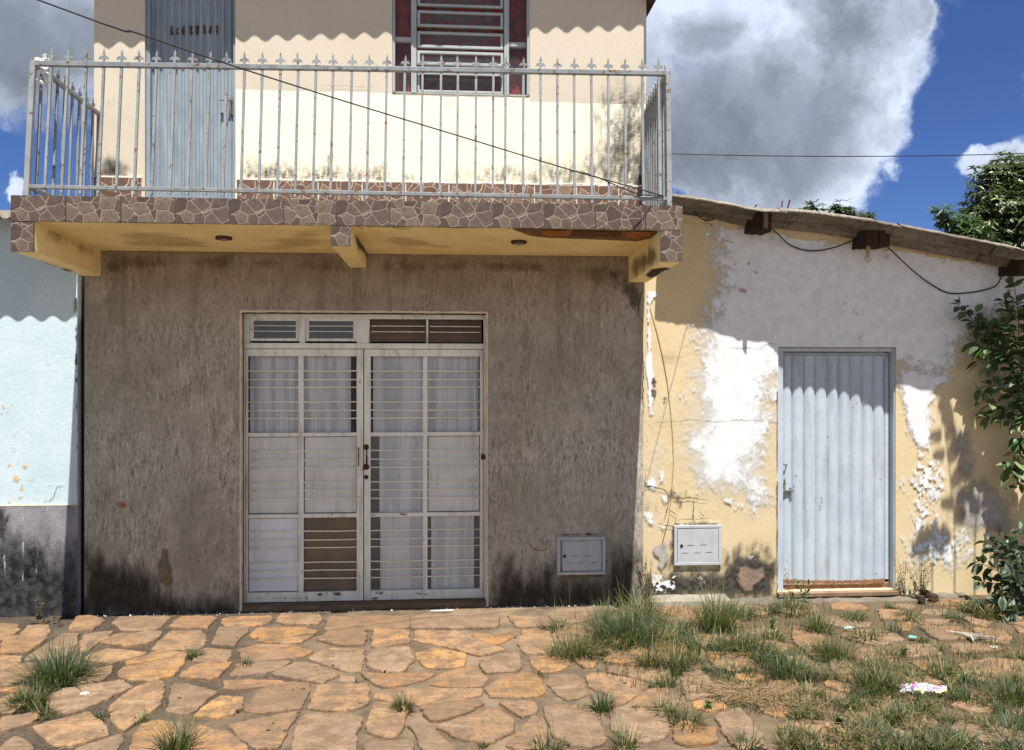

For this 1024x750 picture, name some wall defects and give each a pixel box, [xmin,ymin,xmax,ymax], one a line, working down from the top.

damp [550,93,642,185]
peeling [645,292,658,415]
peeling [680,225,1024,568]
peeling [645,470,668,502]
damp [0,509,232,617]
damp [493,523,776,607]
flaking render [644,512,676,593]